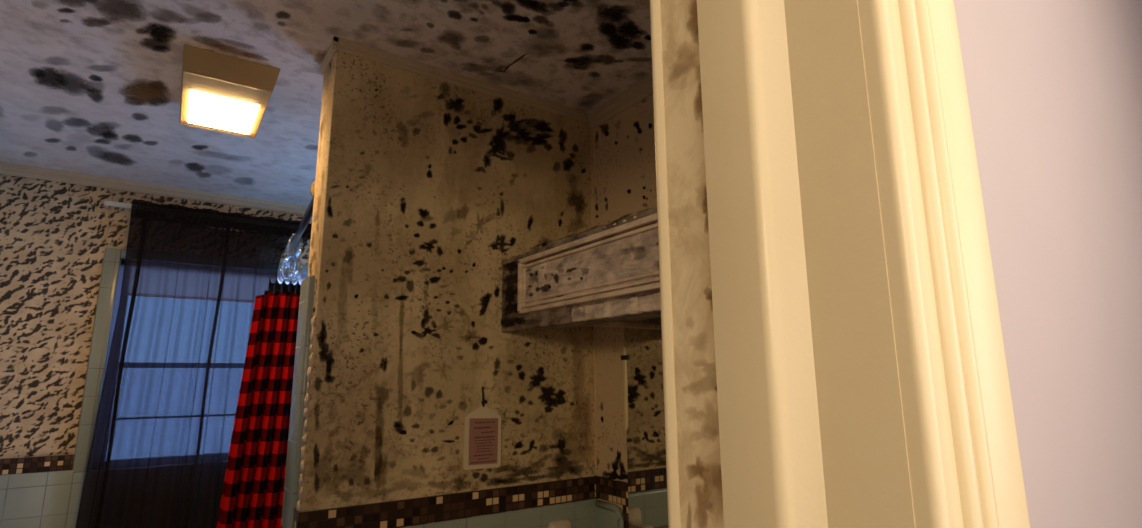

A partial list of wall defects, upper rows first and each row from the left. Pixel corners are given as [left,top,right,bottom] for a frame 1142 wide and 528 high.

leakage [58,0,175,50]
leakage [500,0,651,76]
leakage [35,68,102,102]
leakage [67,119,141,165]
leakage [439,84,586,173]
leakage [559,186,652,232]
leakage [382,198,476,339]
leakage [471,235,583,375]
leakage [312,308,335,390]
leakage [511,365,574,424]
leakage [394,420,459,452]
leakage [473,439,574,485]